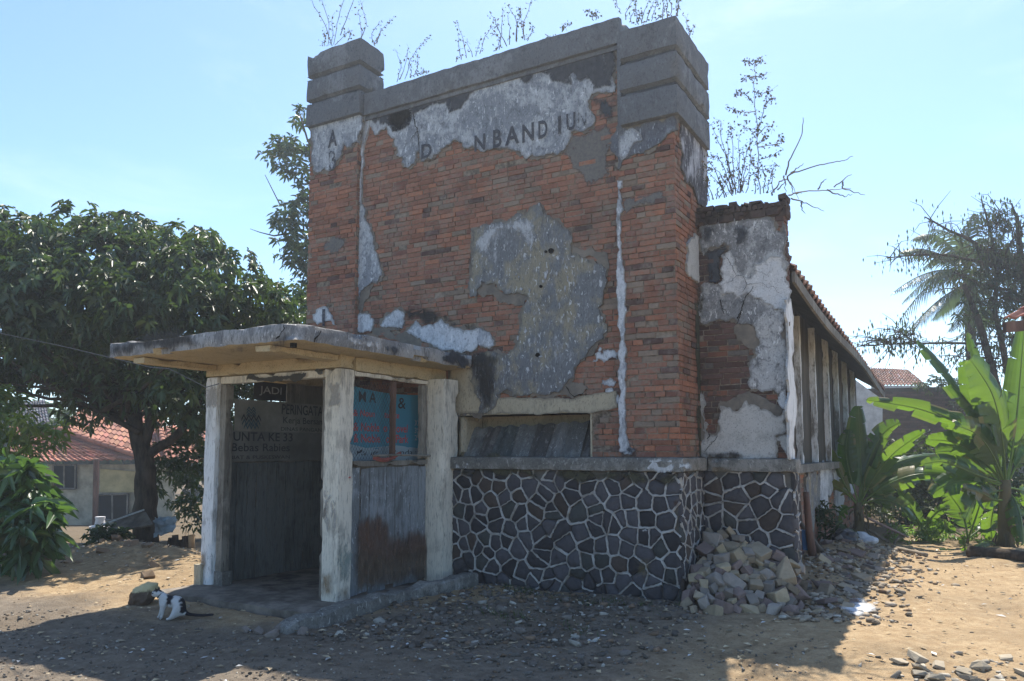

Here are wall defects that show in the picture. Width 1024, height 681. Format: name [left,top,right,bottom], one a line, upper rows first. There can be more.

peeling [308,51,708,455]
peeling [685,216,798,460]
crack [720,258,781,324]
leakage [358,549,427,588]